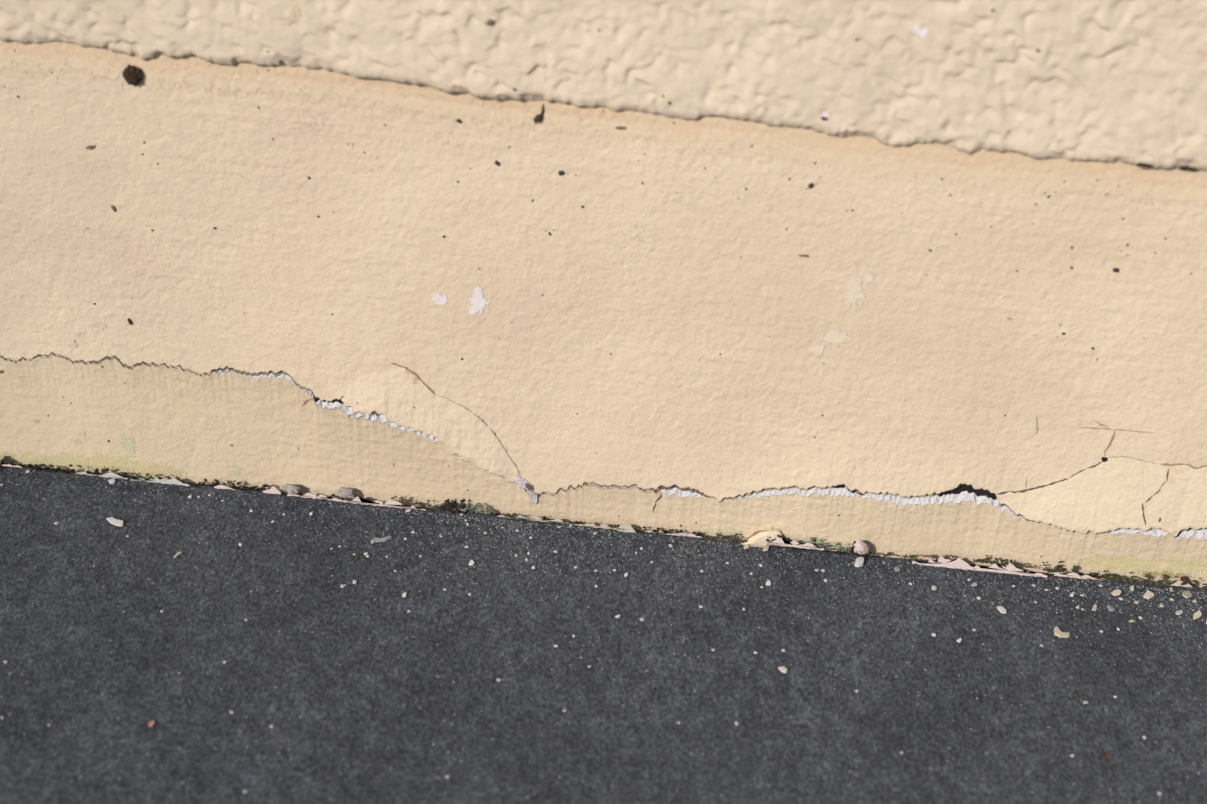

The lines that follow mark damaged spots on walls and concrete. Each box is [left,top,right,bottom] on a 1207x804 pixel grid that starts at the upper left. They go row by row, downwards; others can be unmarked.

spalling [212,369,442,444]
crack [388,362,856,510]
peeling [497,475,703,538]
spalling [736,487,1029,522]
crack [996,420,1207,532]
spalling [1107,528,1207,541]